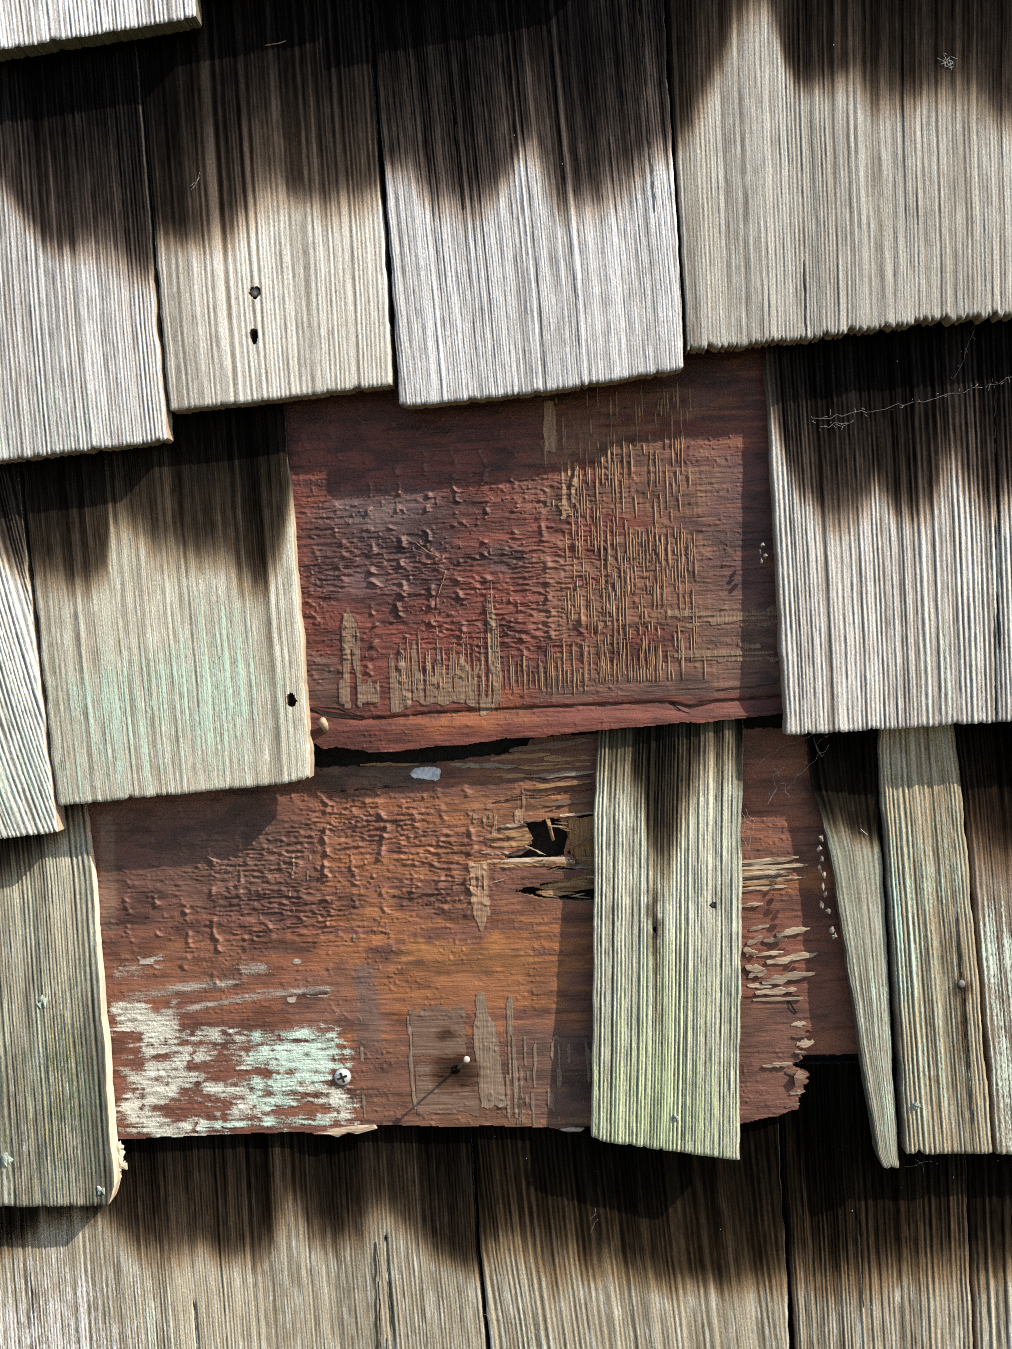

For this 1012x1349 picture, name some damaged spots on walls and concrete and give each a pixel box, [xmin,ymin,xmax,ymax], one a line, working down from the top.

peeling [115,955,163,977]
peeling [109,963,366,1137]